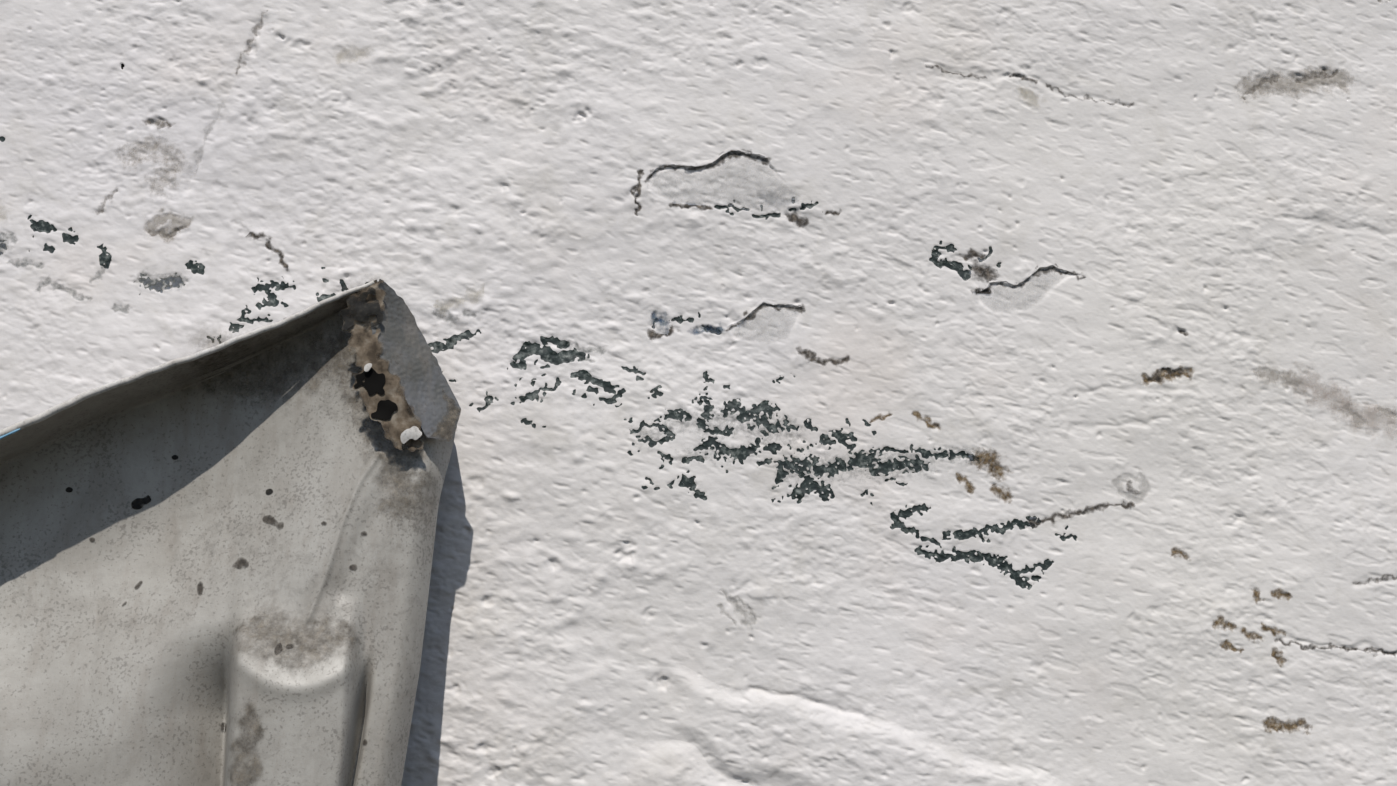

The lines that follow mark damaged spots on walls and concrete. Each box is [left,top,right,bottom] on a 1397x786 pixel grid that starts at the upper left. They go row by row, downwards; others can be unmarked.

spalling [133,119,176,181]
peeling [22,215,79,267]
peeling [97,244,112,269]
spalling [146,214,191,242]
peeling [134,260,205,295]
peeling [207,232,296,344]
peeling [316,267,349,302]
peeling [648,298,805,339]
peeling [469,336,982,505]
peeling [890,503,1121,590]